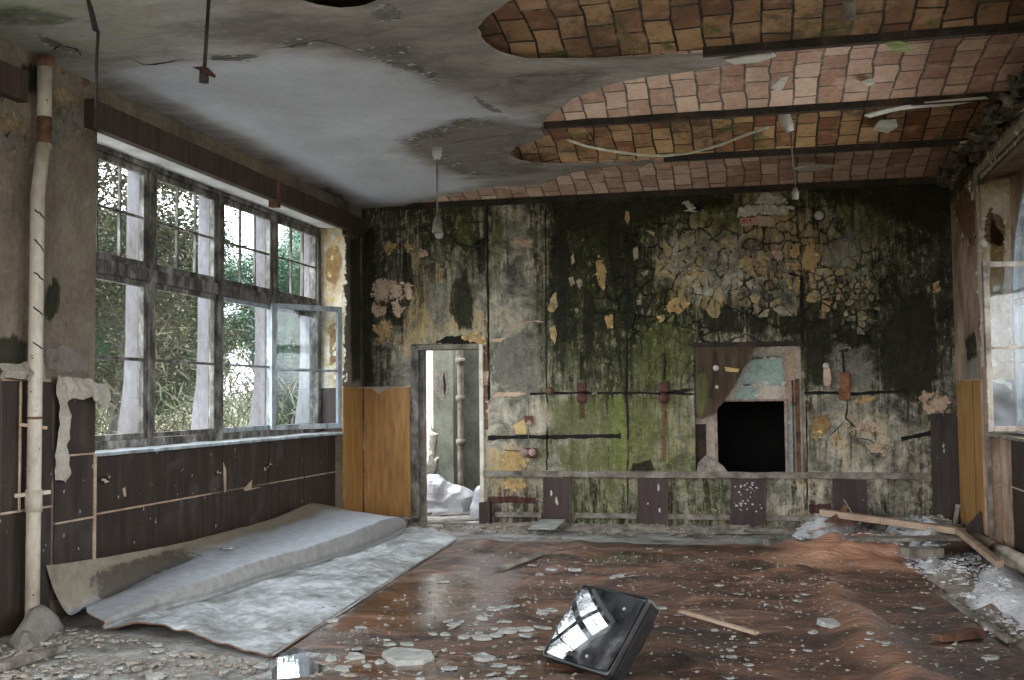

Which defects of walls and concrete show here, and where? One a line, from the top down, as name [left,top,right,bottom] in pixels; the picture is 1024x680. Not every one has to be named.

spalling [303,0,402,22]
spalling [408,0,1024,203]
damp [45,278,61,322]
peeling [321,234,347,382]
damp [350,226,414,386]
peeling [370,278,413,345]
damp [449,238,486,330]
damp [549,194,734,363]
crack [655,231,880,344]
damp [702,291,940,401]
peeling [919,390,951,415]
peeling [953,108,1024,367]